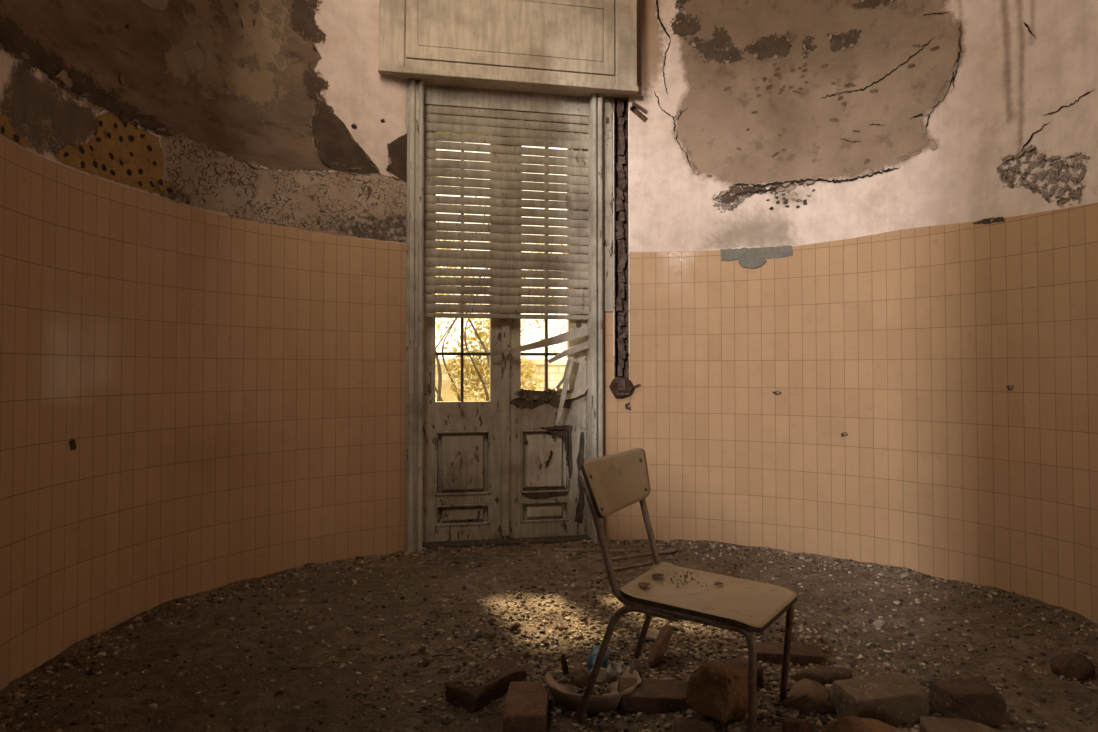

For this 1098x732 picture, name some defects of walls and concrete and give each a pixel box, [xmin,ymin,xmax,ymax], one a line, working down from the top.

peeling [0,0,407,183]
crack [654,0,691,166]
peeling [672,0,817,63]
spalling [713,181,815,213]
peeling [827,29,861,52]
peeling [852,0,896,10]
crack [821,11,961,136]
peeling [997,90,1092,207]